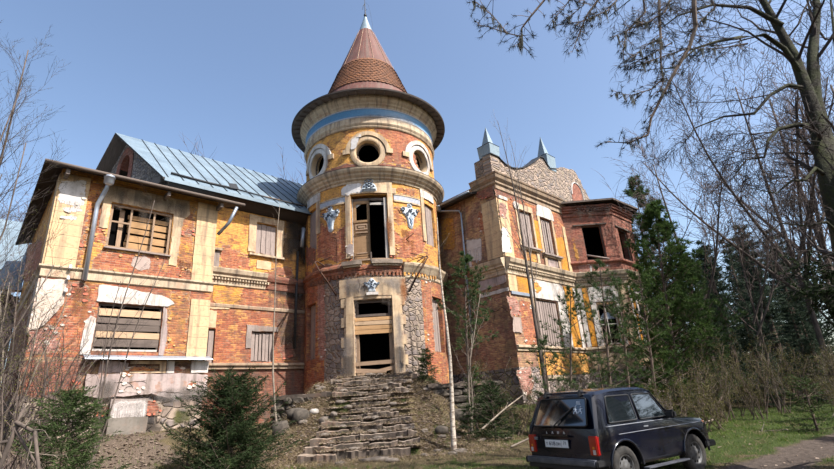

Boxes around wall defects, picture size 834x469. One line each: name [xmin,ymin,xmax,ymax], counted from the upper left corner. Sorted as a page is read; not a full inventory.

flaking render [58,180,197,280]
flaking render [18,280,99,398]
flaking render [166,291,191,354]
flaking render [115,366,155,394]
flaking render [146,400,162,431]